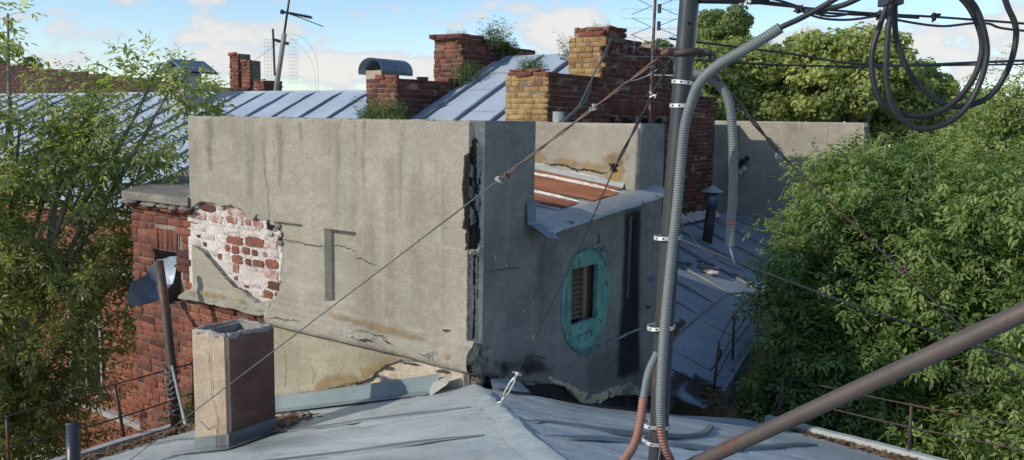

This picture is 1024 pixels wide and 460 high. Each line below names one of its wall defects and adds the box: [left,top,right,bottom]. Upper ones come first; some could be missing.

crack [548,163,607,174]
crack [263,139,374,265]
rust [534,169,620,207]
spalling [125,196,283,302]
flaking render [332,131,501,389]
crack [351,330,390,344]
spalling [547,376,640,404]